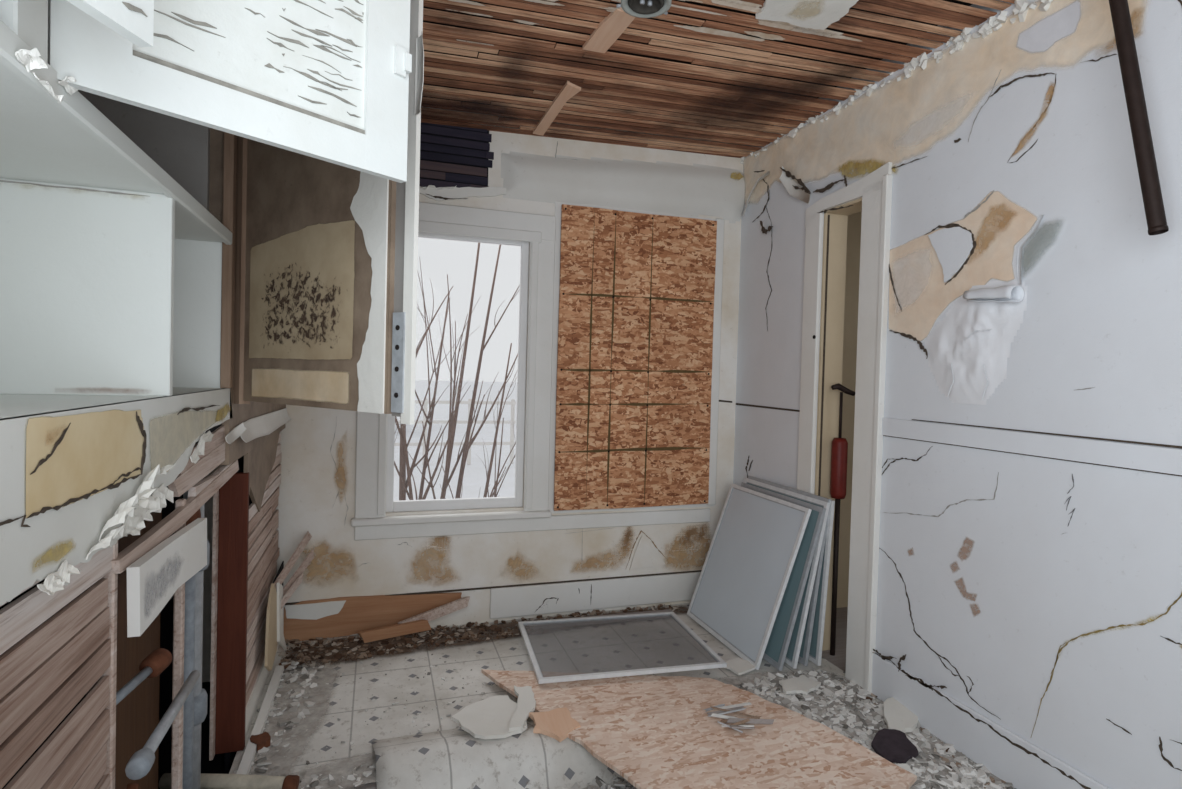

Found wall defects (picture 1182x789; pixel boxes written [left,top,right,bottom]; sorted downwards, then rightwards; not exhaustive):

spalling [1128,0,1145,35]
spalling [740,0,1117,216]
spalling [419,117,506,201]
crack [753,170,772,331]
peeling [889,191,1044,405]
crack [882,449,930,474]
crack [884,472,999,517]
crack [1063,474,1075,534]
spalling [0,404,314,789]
peeling [951,538,980,615]
crack [872,548,1182,789]